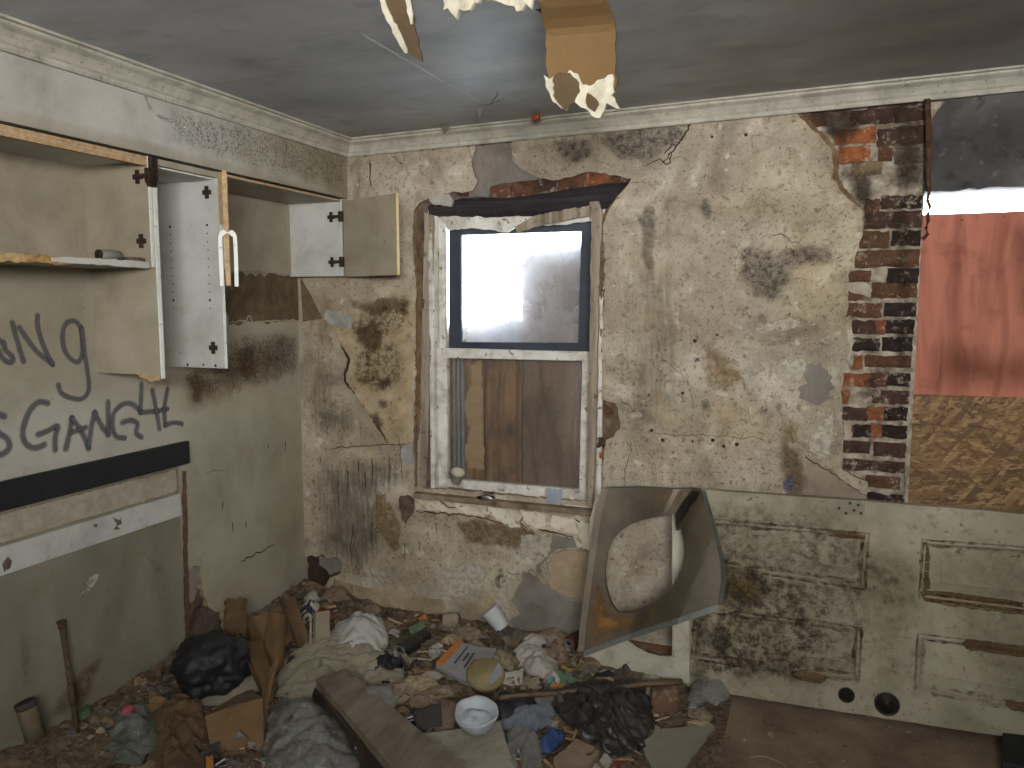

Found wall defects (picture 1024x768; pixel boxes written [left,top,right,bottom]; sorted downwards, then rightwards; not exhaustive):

spalling [445,142,631,224]
leakage [353,299,407,312]
peeling [757,316,799,332]
leakage [741,247,831,298]
flaking render [776,99,945,503]
spalling [305,199,591,636]
spalling [596,400,620,488]
leakage [326,457,390,563]